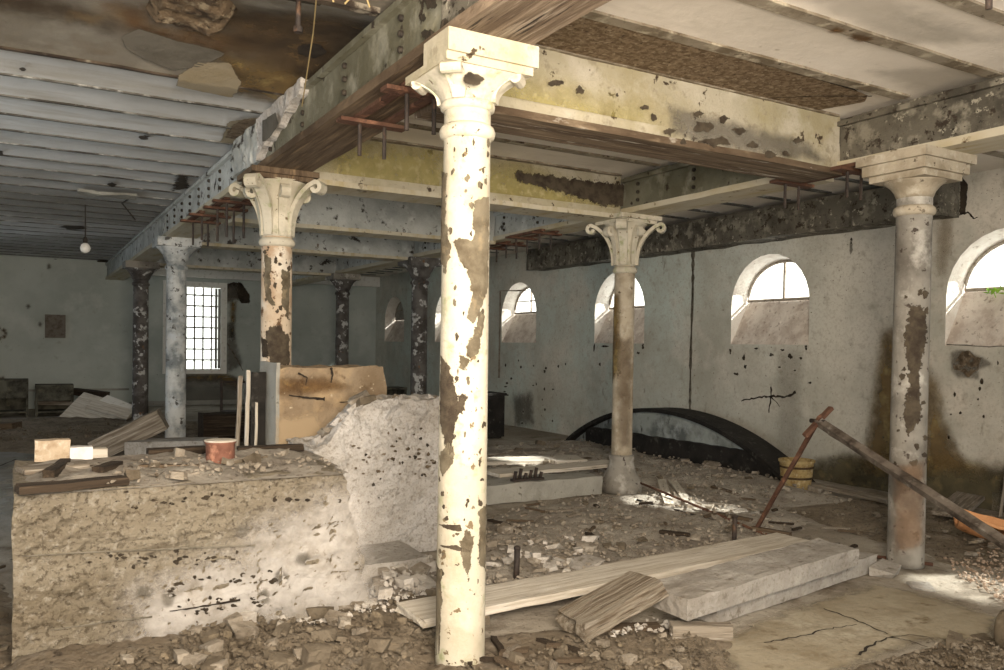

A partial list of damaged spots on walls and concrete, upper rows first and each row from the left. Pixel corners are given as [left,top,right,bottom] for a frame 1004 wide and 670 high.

peeling [122,0,241,97]
spalling [536,17,872,110]
spalling [220,118,257,143]
peeling [663,111,819,160]
peeling [515,170,624,208]
peeling [261,250,291,365]
peeling [351,139,490,656]
water stain [812,330,893,492]
peeling [893,289,929,467]
water stain [926,378,1004,512]
spalling [952,351,999,400]
crack [764,608,930,655]